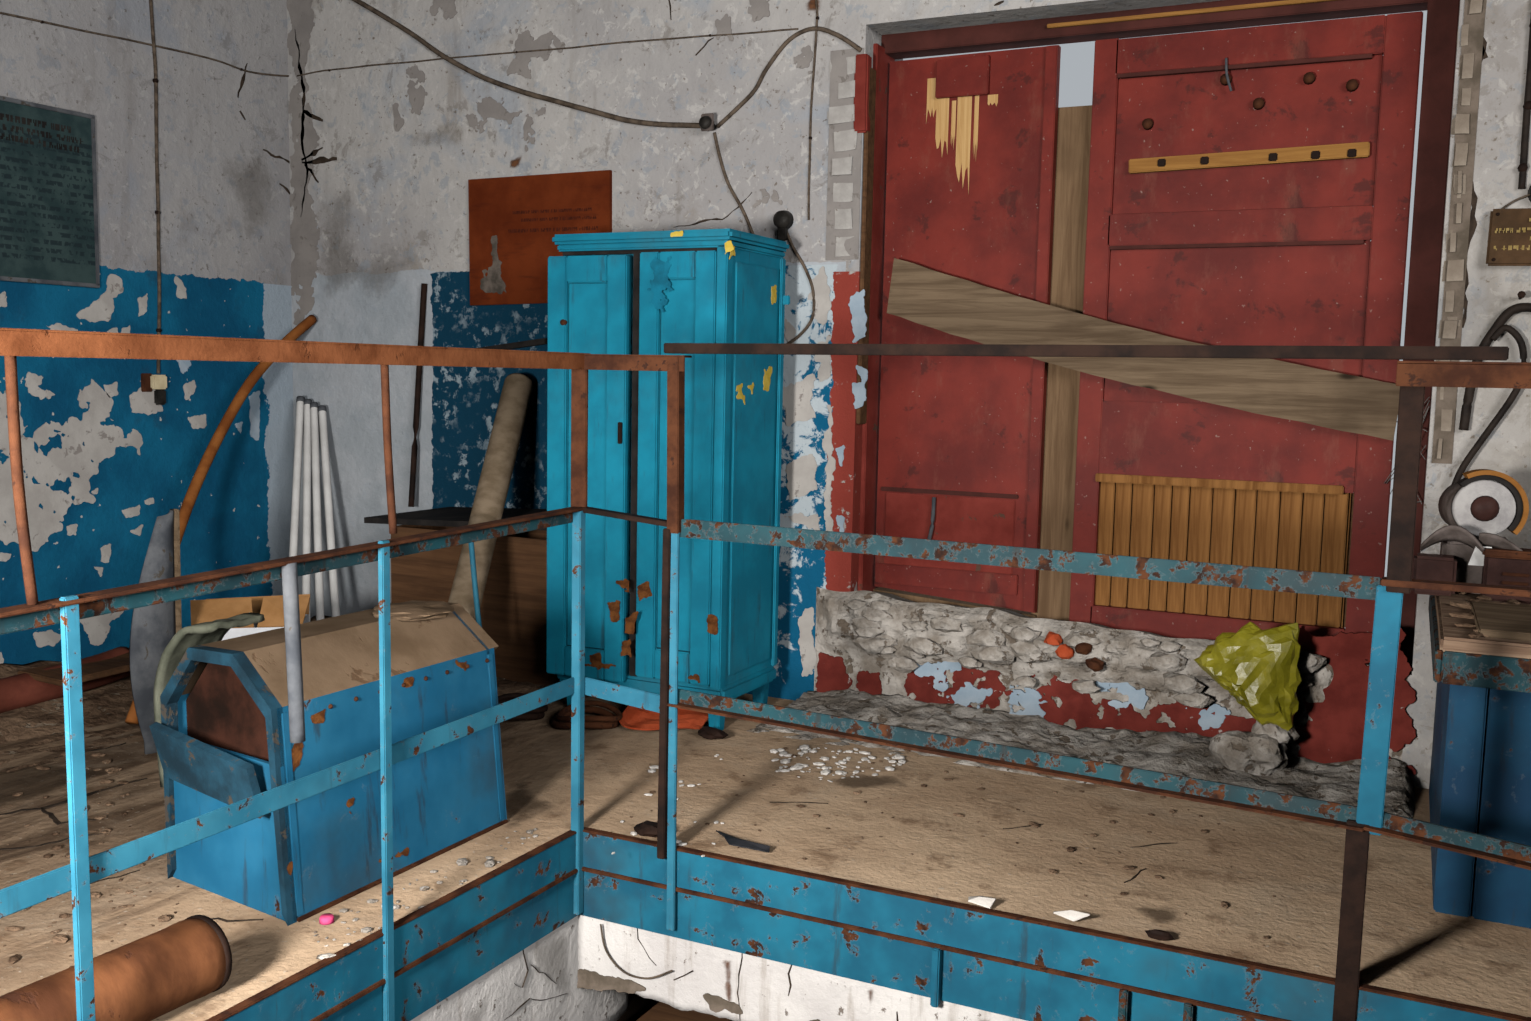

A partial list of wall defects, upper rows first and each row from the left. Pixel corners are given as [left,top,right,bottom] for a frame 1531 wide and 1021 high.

flaking render [715,14,734,41]
flaking render [748,0,770,22]
crack [237,32,337,208]
peeling [47,274,148,333]
peeling [174,276,187,299]
flaking render [783,45,868,532]
peeling [176,360,207,429]
peeling [235,391,260,441]
peeling [0,372,163,562]
peeling [94,543,111,577]
spalling [798,587,1373,776]
peeling [1388,627,1416,775]